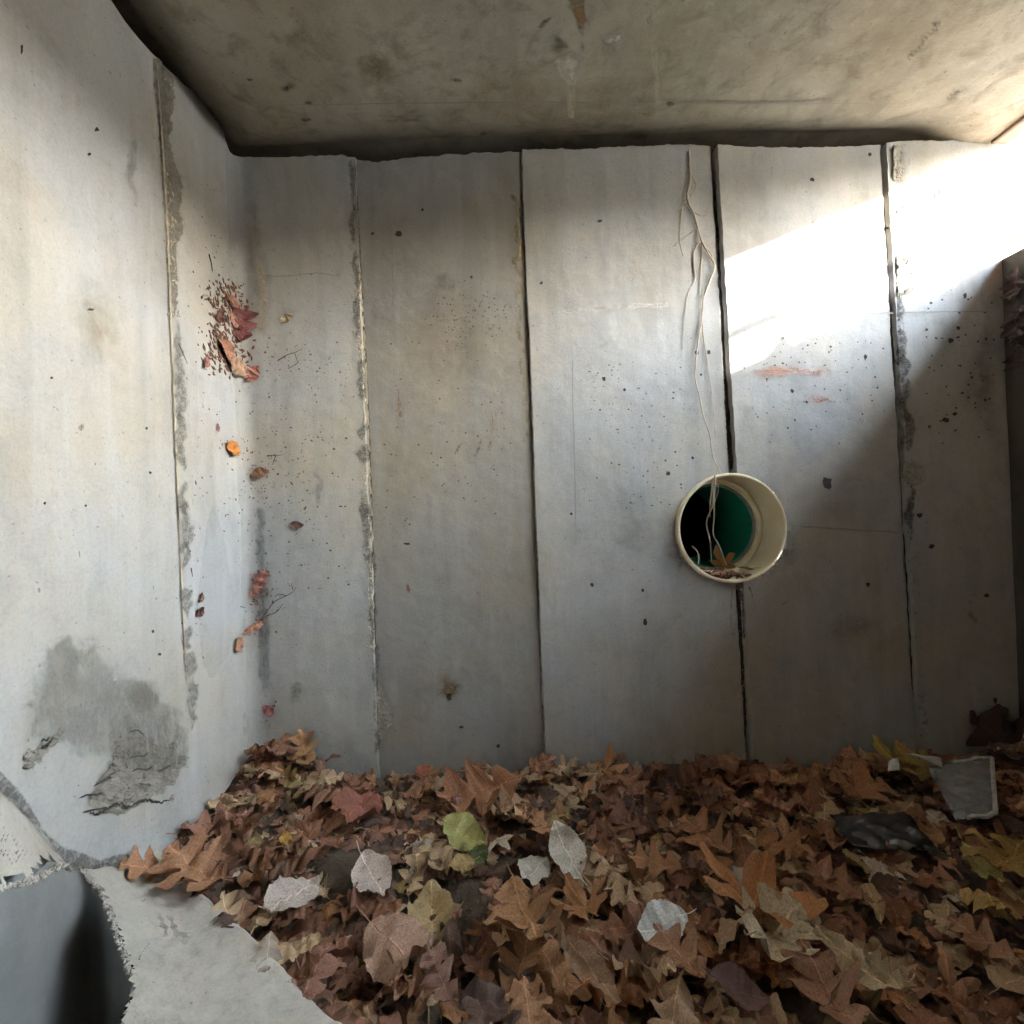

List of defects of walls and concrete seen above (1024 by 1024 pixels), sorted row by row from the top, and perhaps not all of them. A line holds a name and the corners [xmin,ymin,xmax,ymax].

spalling [22,727,65,769]
spalling [80,727,190,816]
spalling [0,862,136,1024]